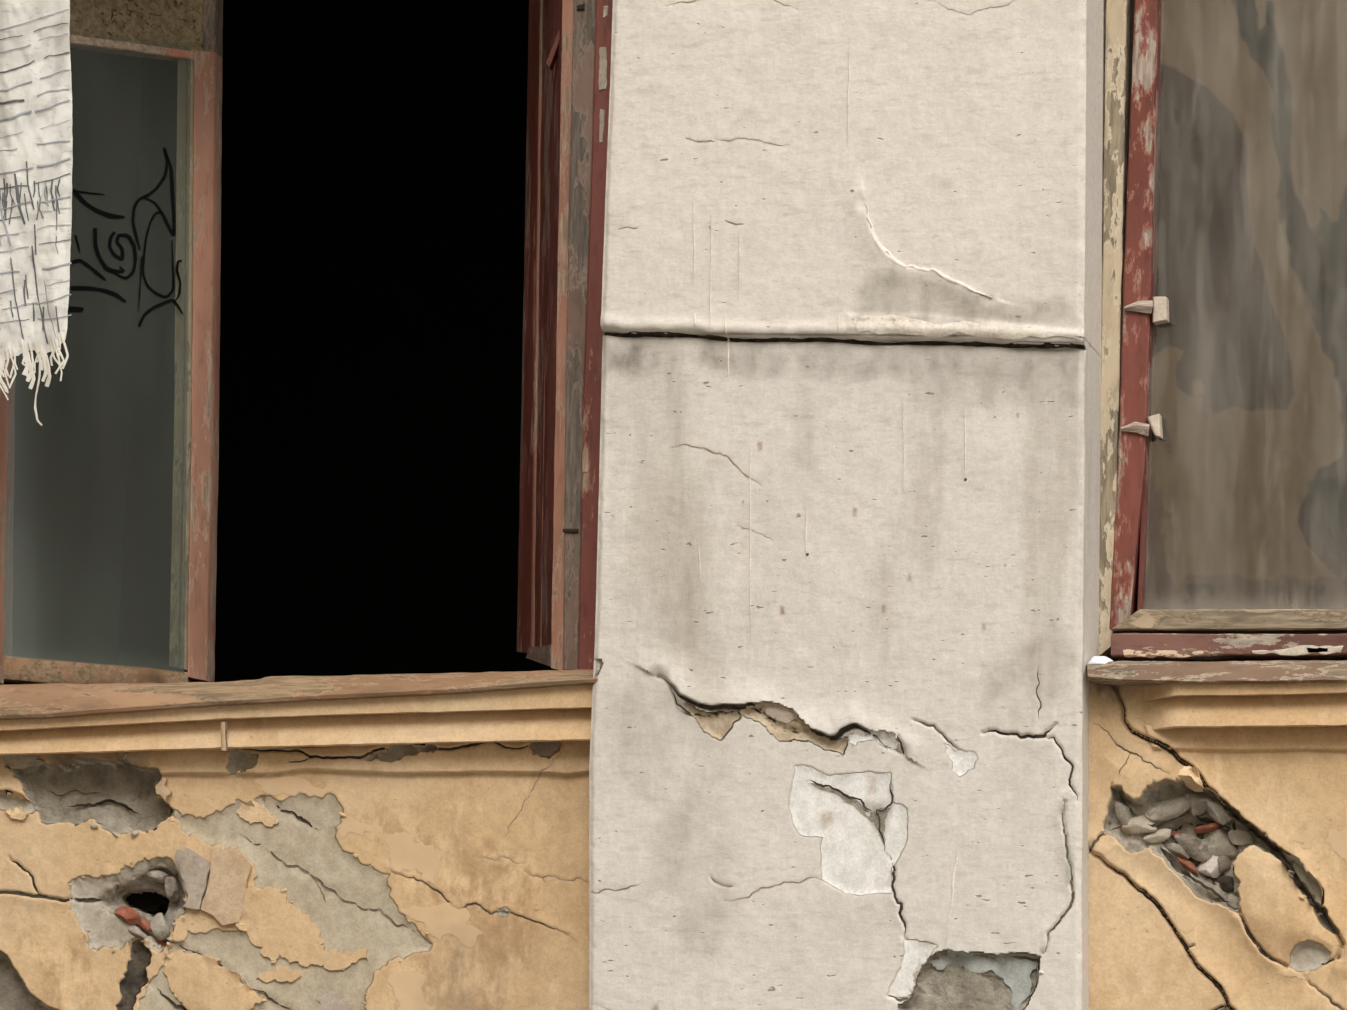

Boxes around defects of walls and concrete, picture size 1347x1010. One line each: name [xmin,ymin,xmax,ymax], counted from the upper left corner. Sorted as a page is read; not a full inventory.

crack [604,331,1085,350]
peeling [0,751,483,1010]
crack [228,742,643,893]
spalling [685,702,898,754]
crack [661,677,958,754]
peeling [789,765,907,895]
crack [887,852,906,936]
crack [985,672,1234,1010]
crack [1095,688,1301,890]
spalling [1101,766,1347,981]
spalling [888,940,1043,1010]
crack [1239,914,1344,1010]